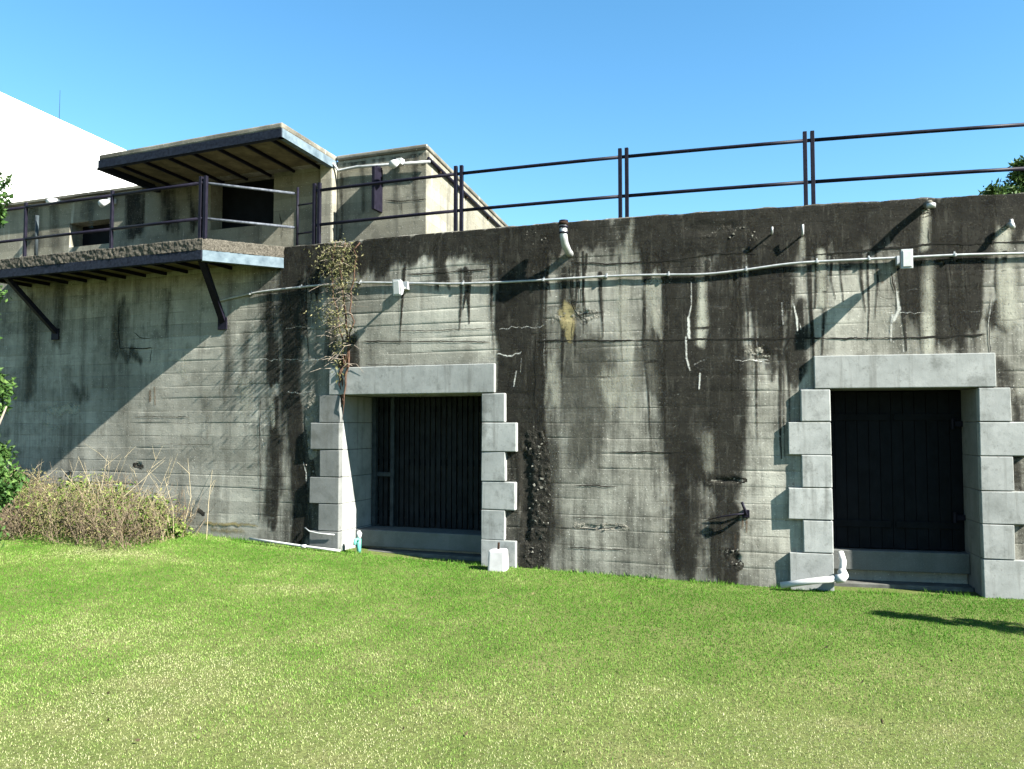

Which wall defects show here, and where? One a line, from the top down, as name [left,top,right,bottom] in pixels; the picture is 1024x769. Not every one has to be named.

water stain [25,296,37,400]
water stain [112,300,142,364]
water stain [262,245,337,545]
water stain [350,336,359,367]
water stain [434,235,472,330]
corrosion [559,302,574,343]
water stain [490,204,879,584]
water stain [890,195,1022,354]
water stain [997,360,1021,422]